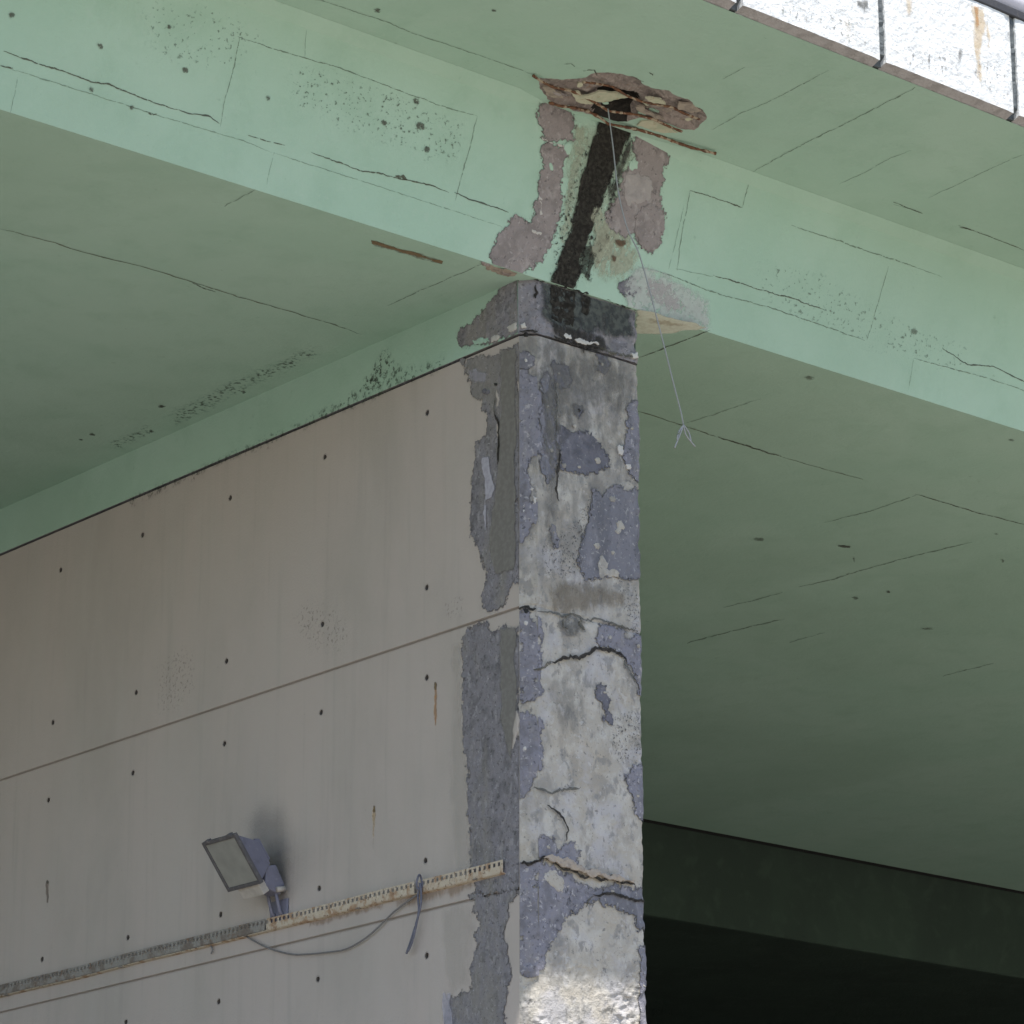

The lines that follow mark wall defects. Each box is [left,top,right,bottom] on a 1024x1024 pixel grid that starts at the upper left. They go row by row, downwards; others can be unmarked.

crack [0,51,217,122]
crack [2,229,358,334]
rust [371,241,443,264]
leakage [543,122,709,352]
crack [716,276,824,310]
leakage [309,356,441,423]
crack [945,350,1024,382]
crack [638,411,860,479]
crack [916,494,1021,524]
peeling [442,72,717,1024]
crack [519,605,638,683]
crack [521,787,645,907]